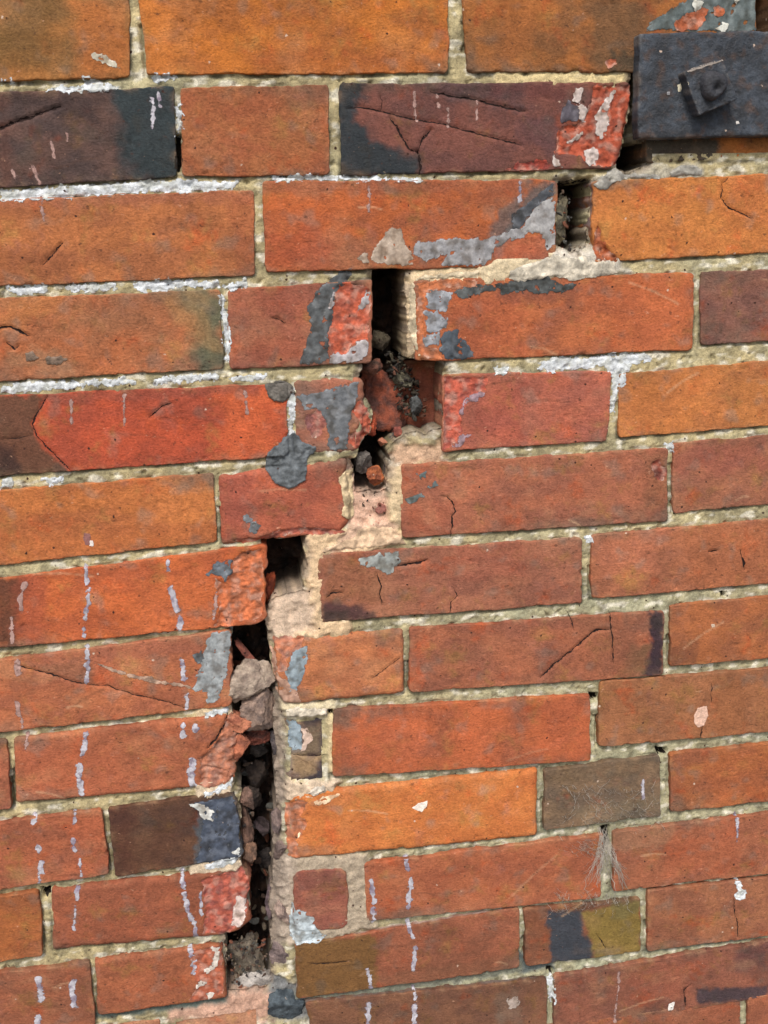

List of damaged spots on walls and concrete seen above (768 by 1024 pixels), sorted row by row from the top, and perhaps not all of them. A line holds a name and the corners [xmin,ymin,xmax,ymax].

spalling [505,85,630,172]
crack [358,269,401,378]
spalling [300,184,580,365]
water stain [179,659,229,739]
crack [231,620,270,670]
spalling [192,514,345,703]
crack [264,536,303,576]
water stain [186,757,233,797]
spalling [189,712,250,1001]
crack [208,700,324,949]
water stain [179,867,204,975]
water stain [403,854,418,971]